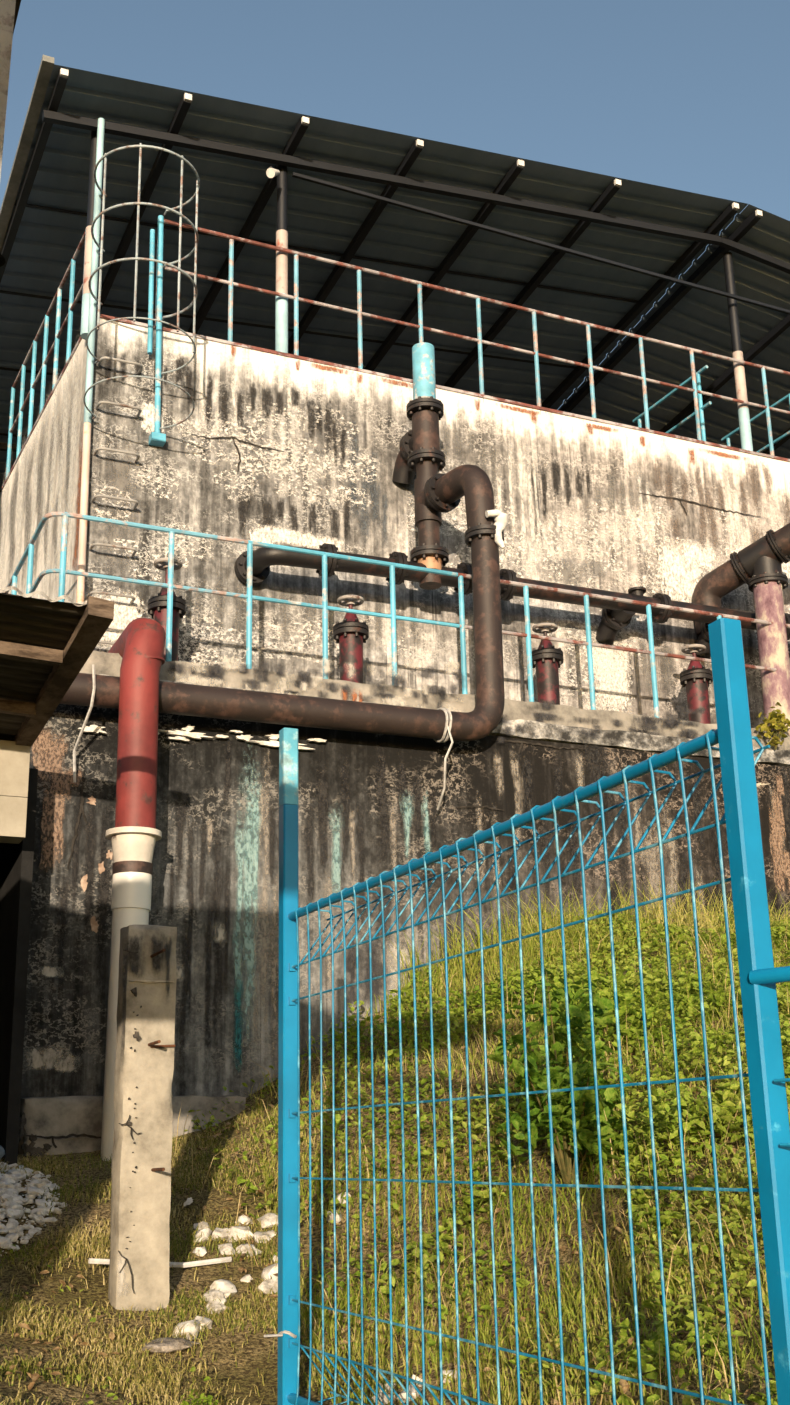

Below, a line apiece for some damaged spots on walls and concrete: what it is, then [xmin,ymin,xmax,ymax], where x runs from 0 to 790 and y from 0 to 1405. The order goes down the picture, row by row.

leakage [105,352,141,384]
leakage [164,357,387,541]
leakage [444,428,772,582]
leakage [194,580,243,629]
leakage [376,600,420,648]
leakage [510,646,527,667]
leakage [57,804,110,985]
leakage [121,787,279,1069]
leakage [305,749,436,1005]
leakage [496,757,551,912]
leakage [555,744,724,922]
leakage [772,767,790,858]